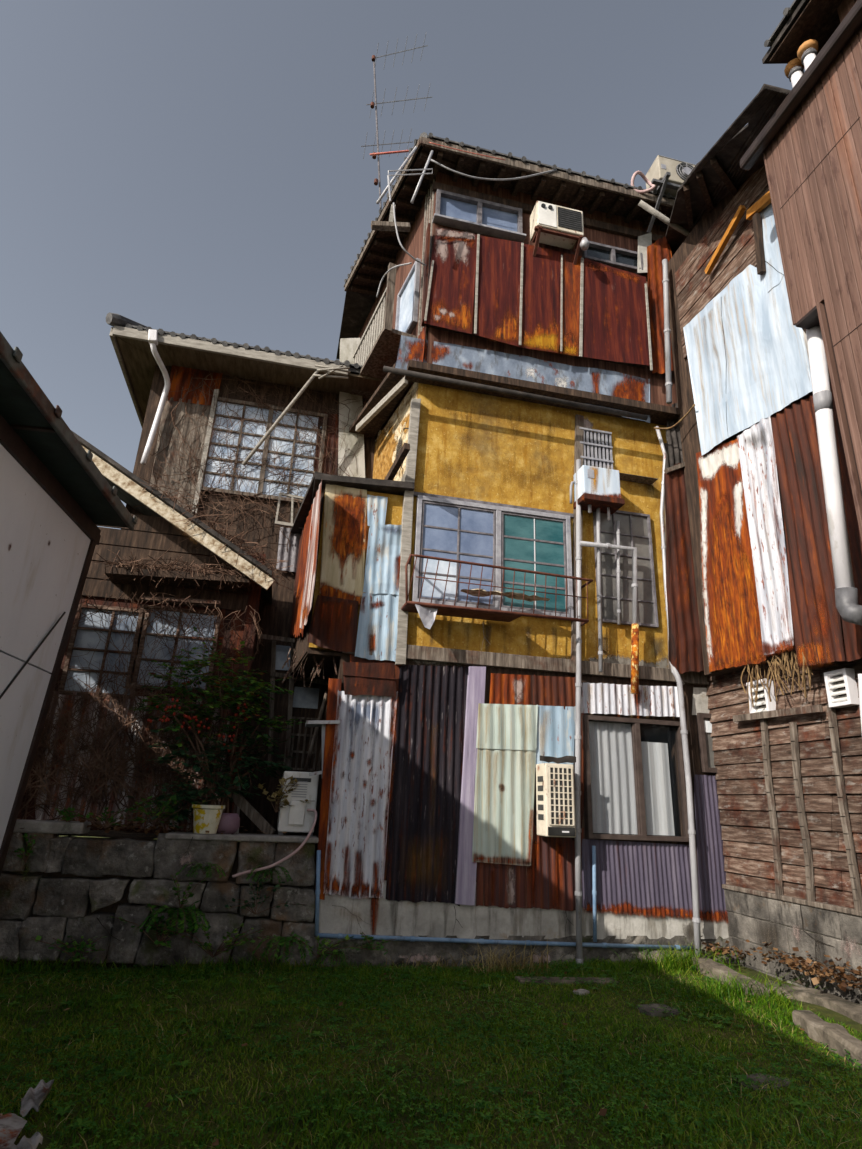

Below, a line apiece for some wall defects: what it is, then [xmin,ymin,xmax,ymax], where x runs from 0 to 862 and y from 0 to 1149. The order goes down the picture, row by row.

corrosion [440,235,475,248]
corrosion [405,341,449,362]
corrosion [432,302,470,328]
corrosion [495,315,577,354]
corrosion [592,372,645,415]
corrosion [313,486,383,610]
peeling [699,443,740,655]
peeling [734,482,743,537]
corrosion [713,494,830,665]
corrosion [631,623,641,718]
corrosion [324,696,396,934]
corrosion [474,810,539,905]